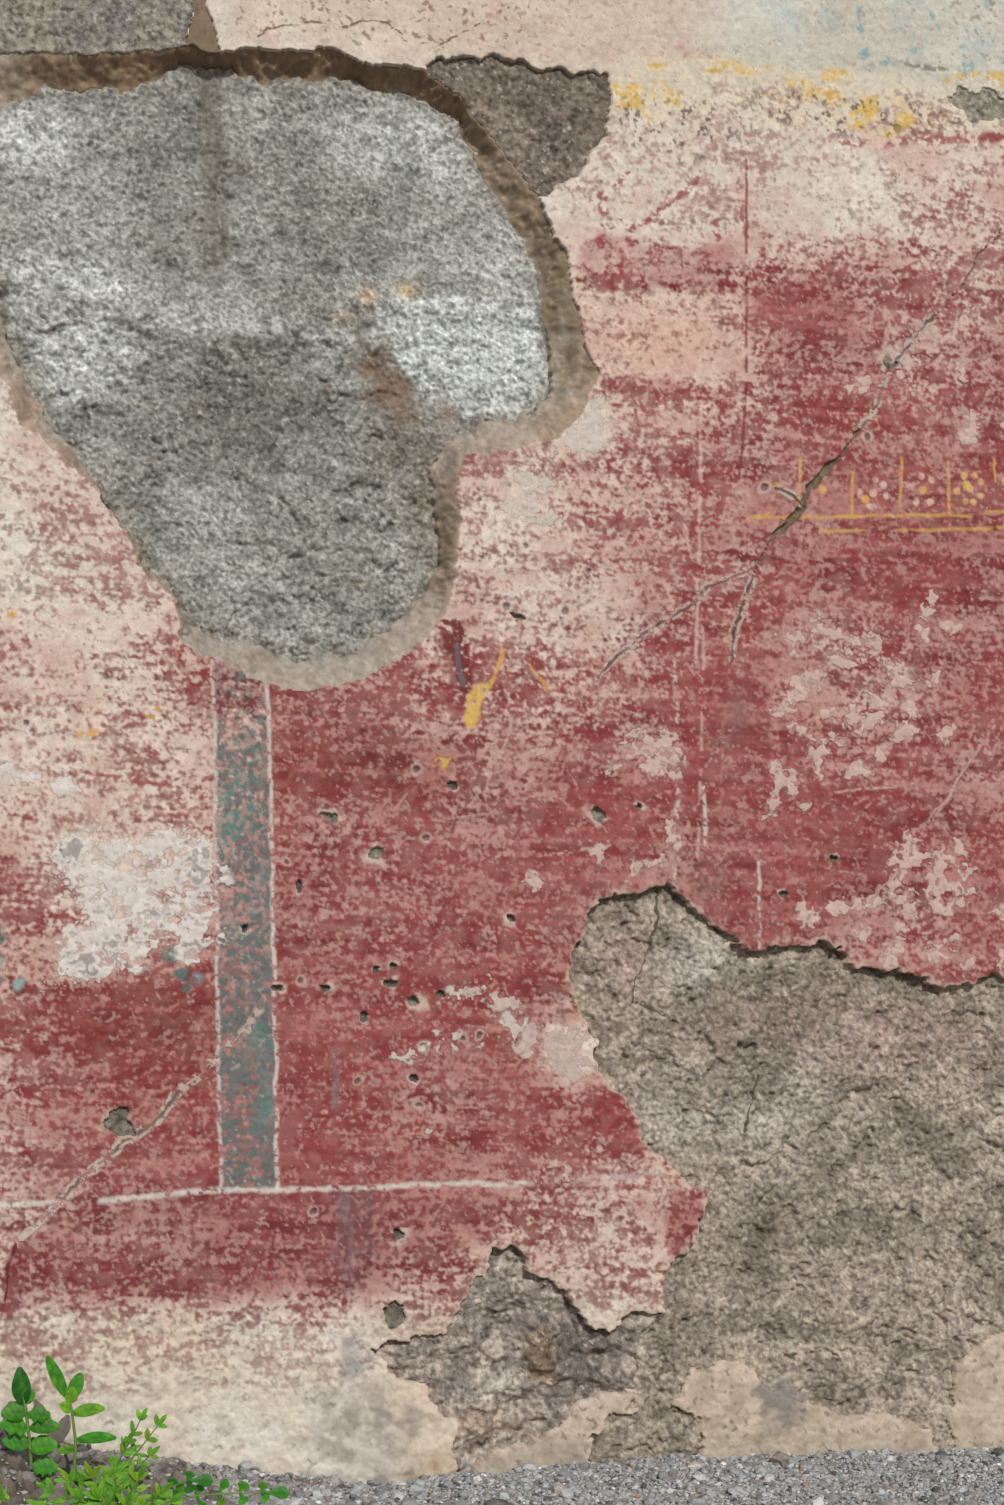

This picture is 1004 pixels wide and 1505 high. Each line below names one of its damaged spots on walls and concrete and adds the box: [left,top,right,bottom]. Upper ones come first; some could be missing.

crack [257,20,403,37]
spalling [947,86,1004,128]
spalling [0,0,619,691]
crack [597,229,1001,679]
peeling [604,728,686,782]
spalling [371,819,1004,1473]